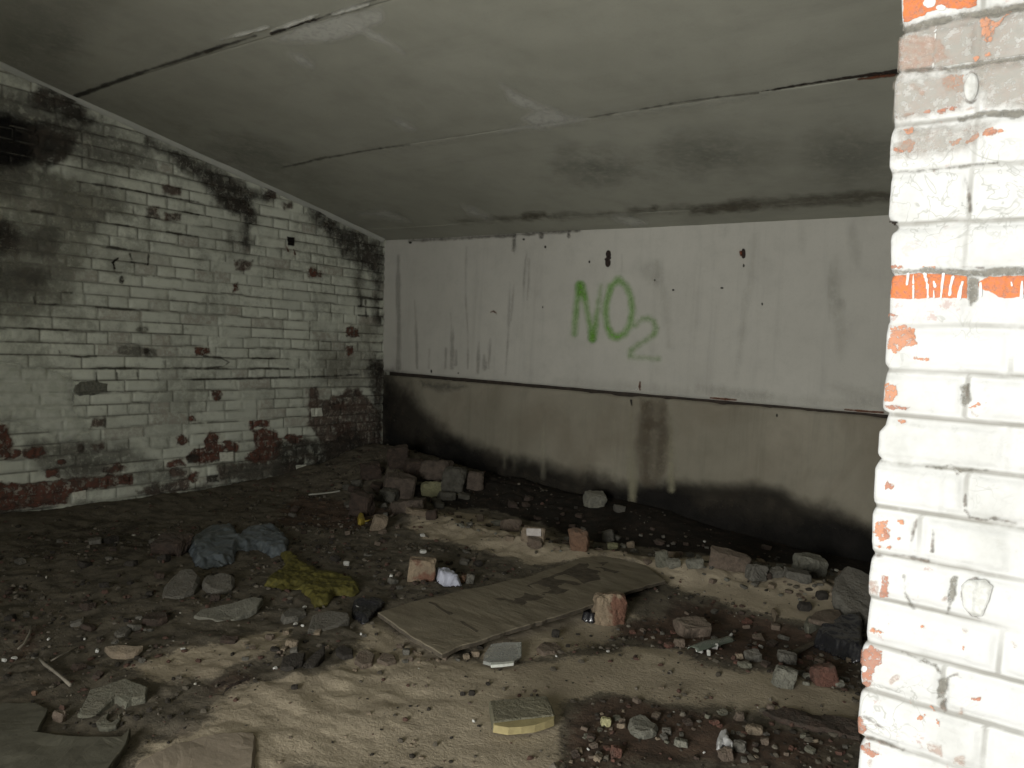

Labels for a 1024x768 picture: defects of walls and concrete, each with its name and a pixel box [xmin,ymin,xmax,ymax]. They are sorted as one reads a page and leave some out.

crack [74,18,319,98]
crack [643,69,899,109]
peeling [893,0,1024,154]
leakage [0,87,268,318]
leakage [313,211,384,322]
peeling [890,265,1024,300]
peeling [887,314,929,361]
peeling [884,383,907,424]
peeling [0,387,382,511]
leakage [222,360,875,563]
peeling [873,520,904,550]
peeling [860,628,883,687]